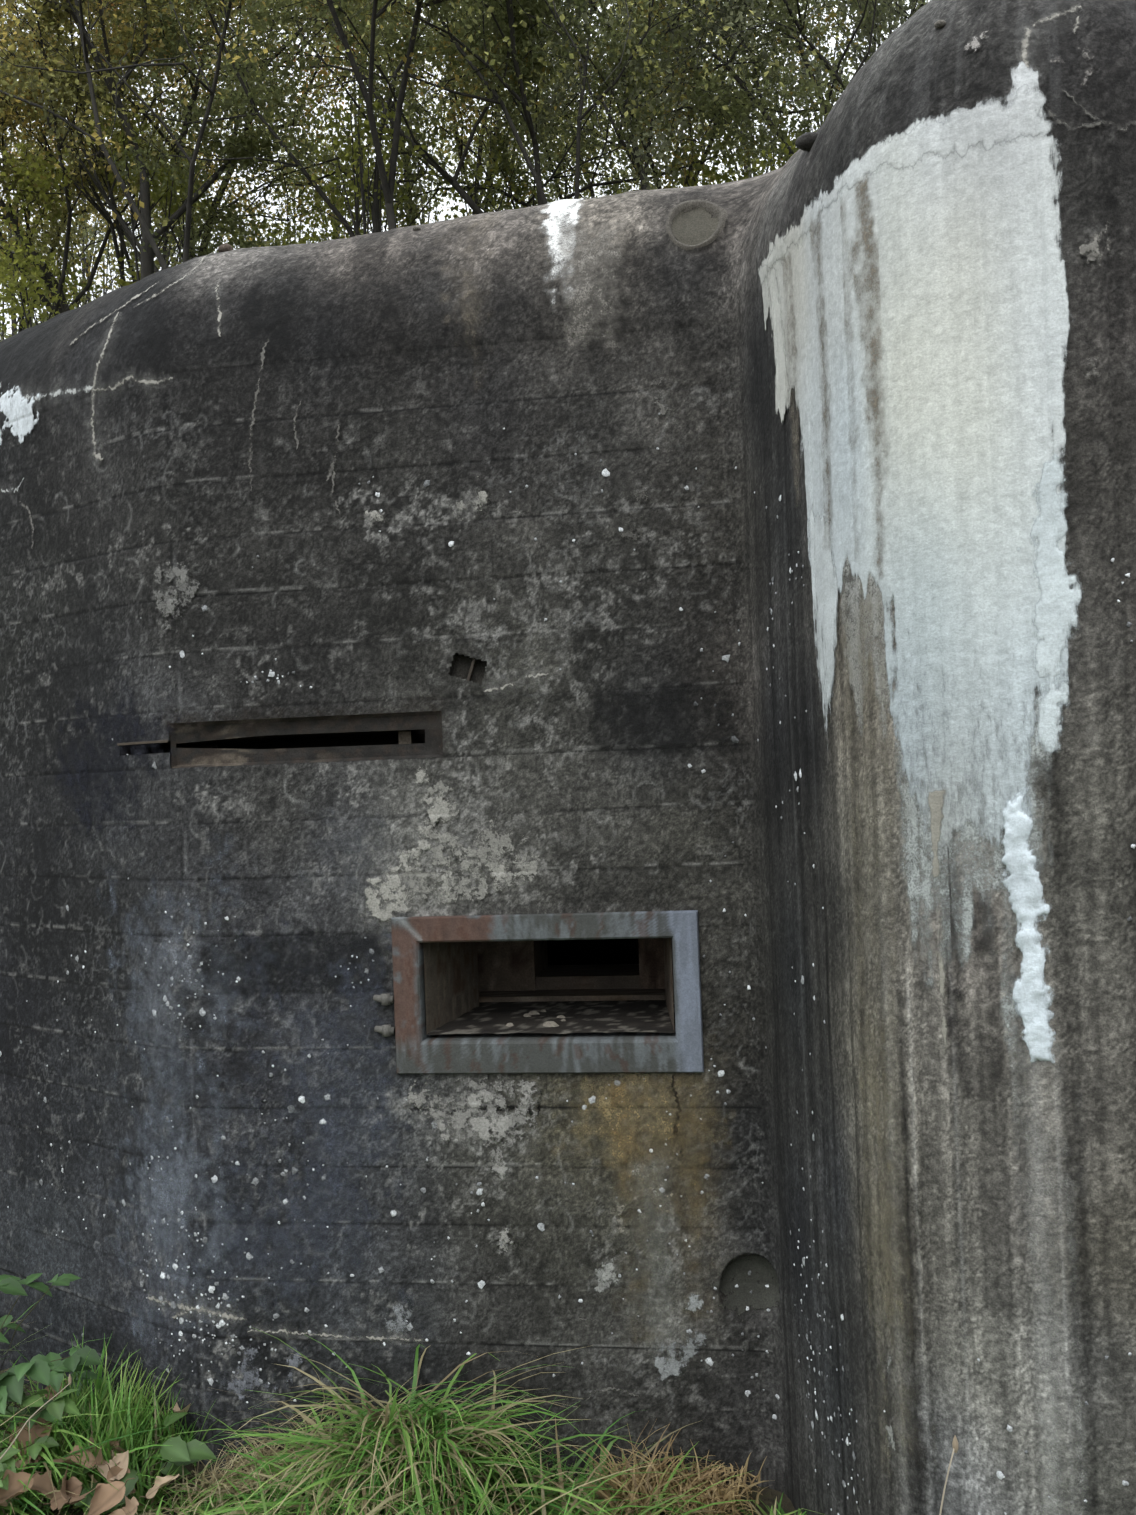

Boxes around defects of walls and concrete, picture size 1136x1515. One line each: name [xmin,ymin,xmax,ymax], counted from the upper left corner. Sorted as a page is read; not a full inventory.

water stain [543,199,619,346]
crack [0,252,222,461]
crack [248,339,269,491]
crack [293,401,301,450]
crack [326,424,340,514]
water stain [758,62,1081,1085]